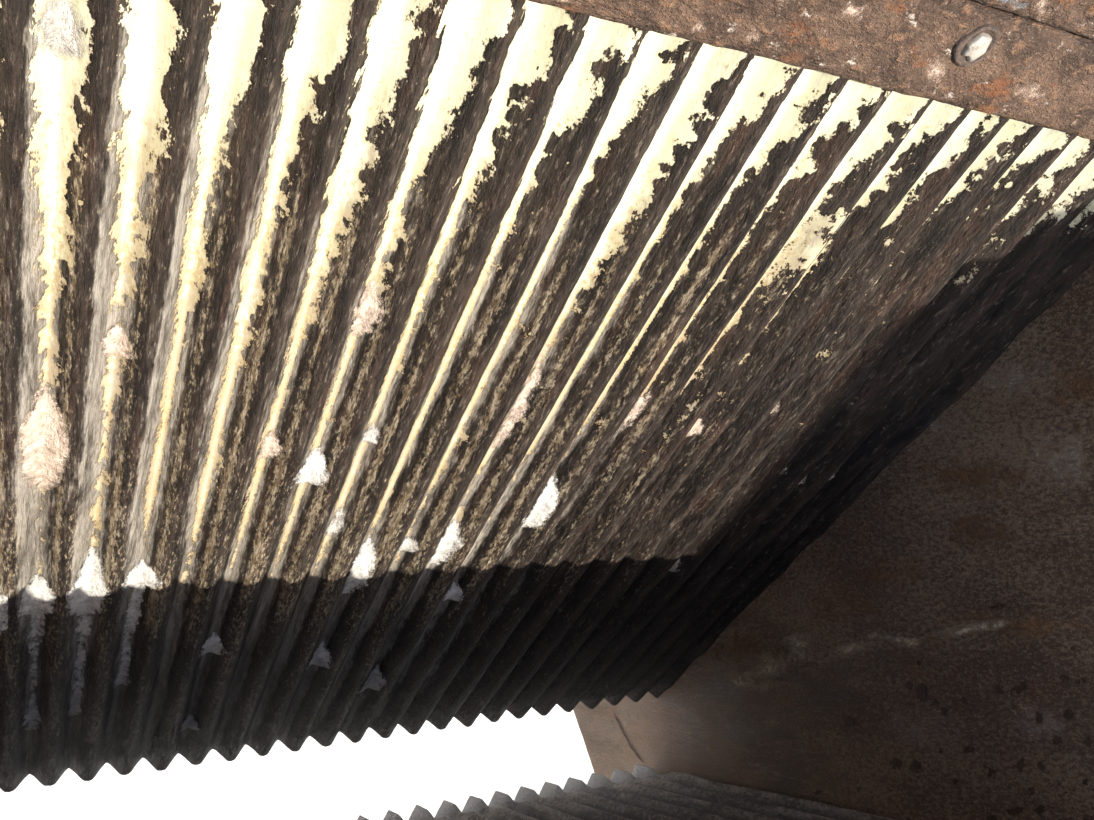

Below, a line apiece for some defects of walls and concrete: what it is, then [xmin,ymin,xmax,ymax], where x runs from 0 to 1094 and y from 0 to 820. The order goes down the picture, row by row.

peeling [26,0,96,395]
peeling [86,0,188,555]
peeling [139,0,275,563]
peeling [175,0,358,607]
peeling [227,0,1094,582]
damp [22,612,46,726]
damp [67,615,92,716]
damp [116,583,146,678]